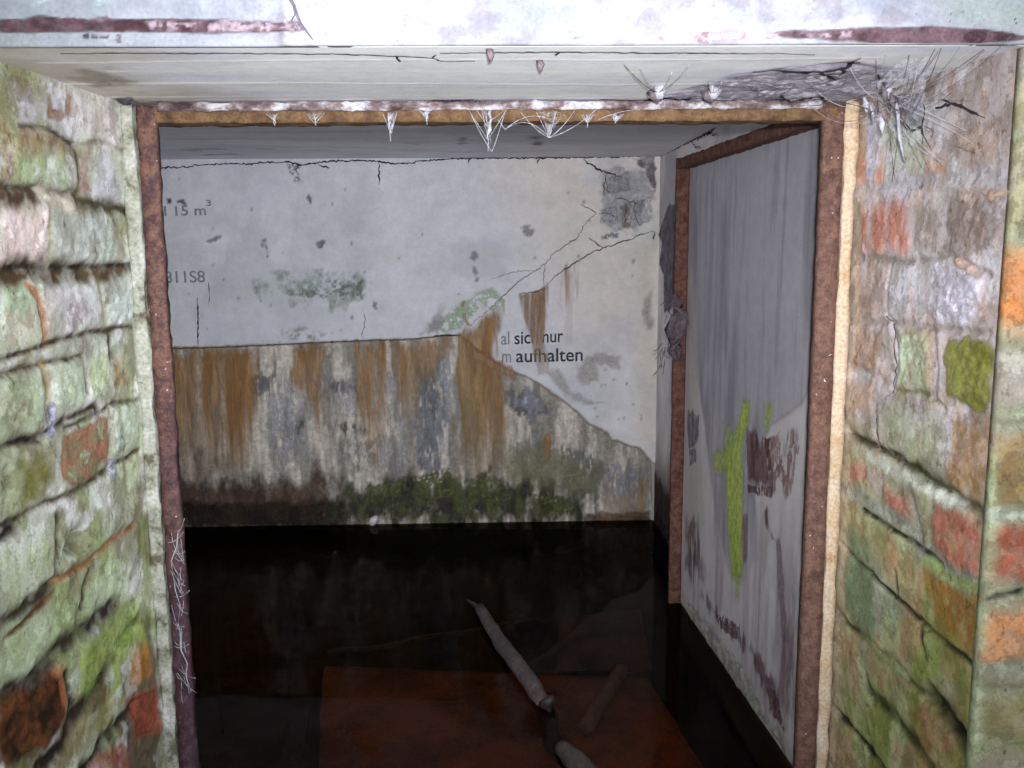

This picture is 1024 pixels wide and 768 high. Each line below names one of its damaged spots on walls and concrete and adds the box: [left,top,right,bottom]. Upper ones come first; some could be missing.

leakage [157,99,823,113]
crack [61,0,985,140]
spalling [664,63,894,103]
spalling [600,157,656,239]
crack [162,157,655,349]
flaking render [659,204,674,312]
spalling [173,336,652,525]
leakage [180,468,360,527]
leakage [585,473,670,541]
leakage [689,605,785,754]